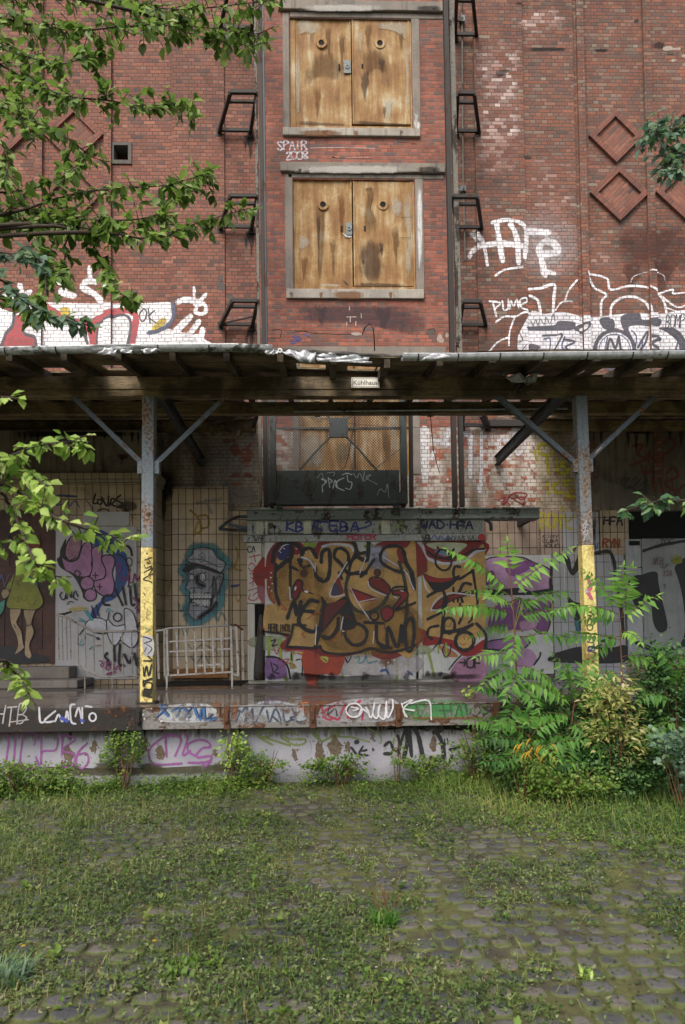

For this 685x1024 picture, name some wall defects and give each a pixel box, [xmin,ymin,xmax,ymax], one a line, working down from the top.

peeling [140,736,165,760]
peeling [315,733,352,763]